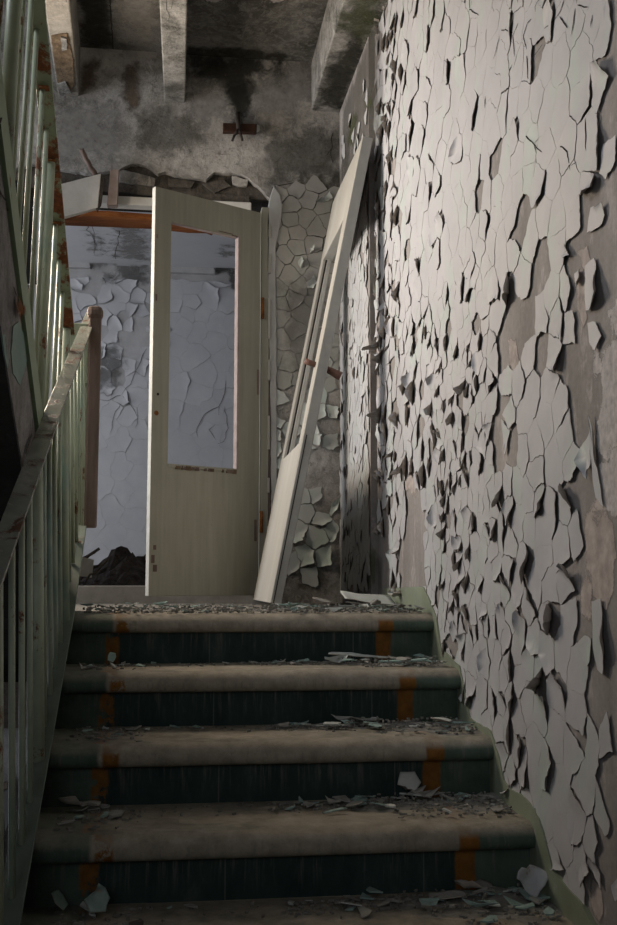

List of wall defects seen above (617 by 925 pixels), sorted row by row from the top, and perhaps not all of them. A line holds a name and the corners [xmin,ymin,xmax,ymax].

leakage [55,105,123,161]
leakage [189,61,311,123]
peeling [48,275,56,363]
peeling [168,279,235,468]
peeling [70,277,157,572]
peeling [276,388,310,469]
peeling [286,0,617,922]